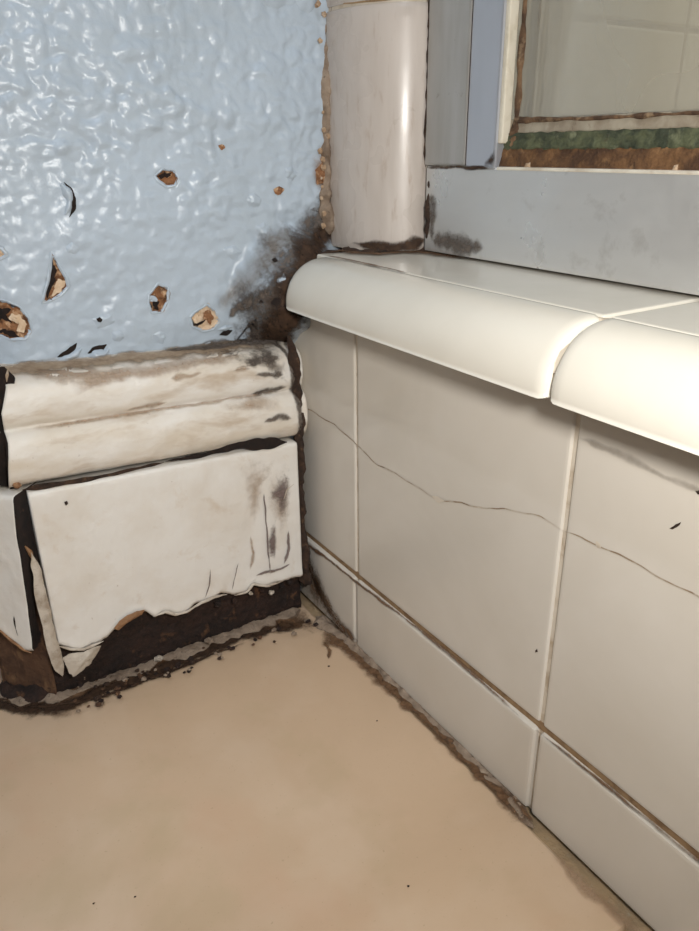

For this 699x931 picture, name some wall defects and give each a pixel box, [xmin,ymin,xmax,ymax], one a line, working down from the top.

peeling [153,168,180,189]
peeling [0,299,34,341]
peeling [41,252,71,304]
peeling [147,282,170,315]
water stain [1,198,403,441]
peeling [189,303,221,333]
crack [0,366,22,489]
crack [308,409,699,598]
crack [25,546,40,565]
peeling [114,482,294,630]
crack [13,613,54,643]
peeling [31,552,103,677]